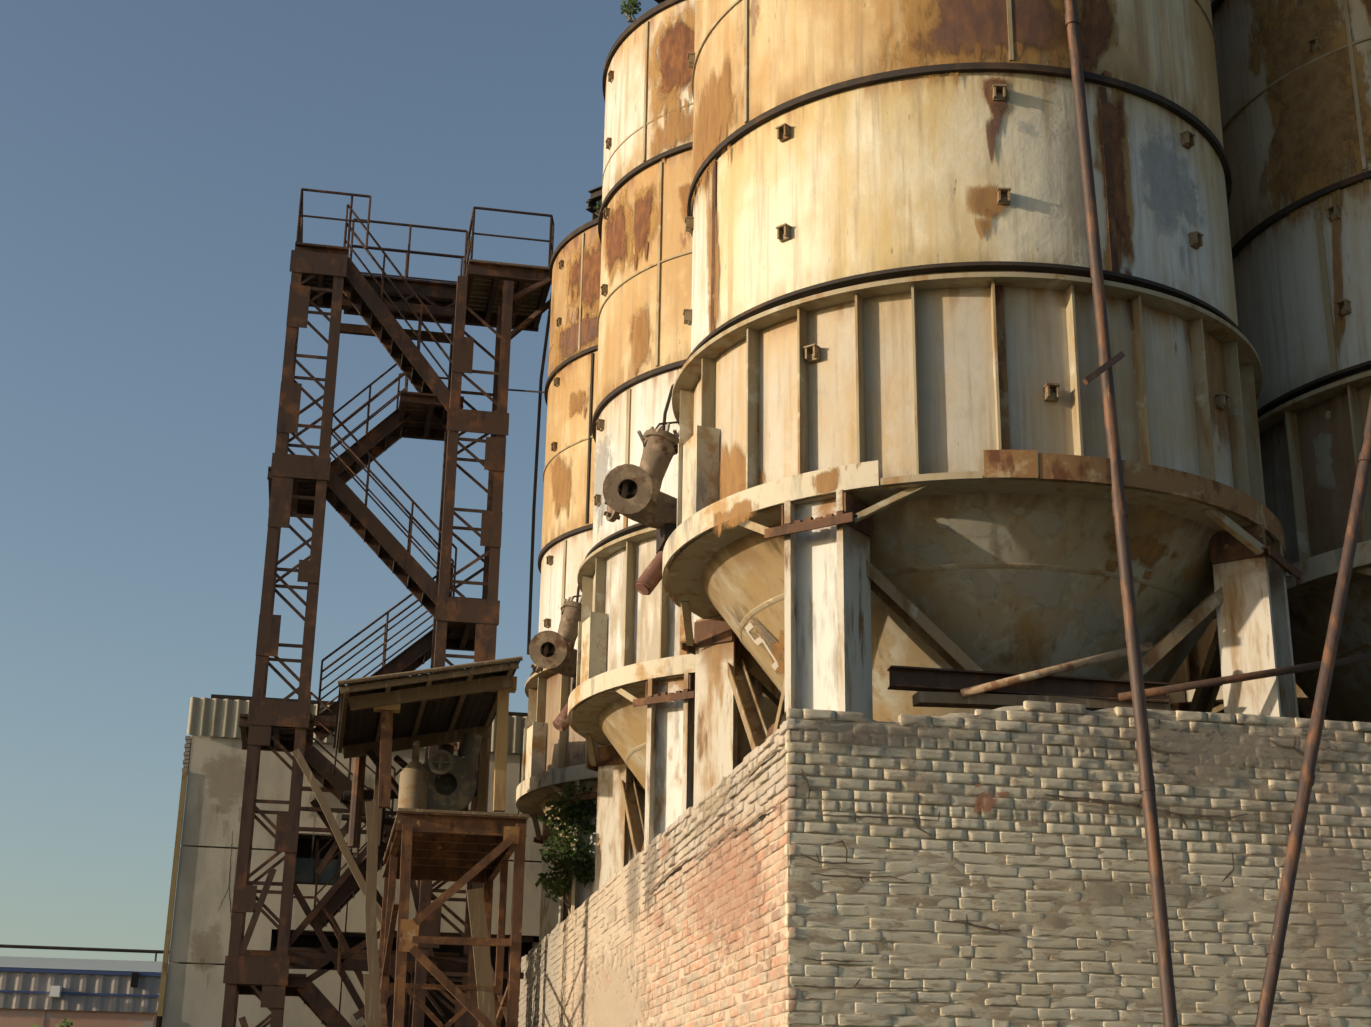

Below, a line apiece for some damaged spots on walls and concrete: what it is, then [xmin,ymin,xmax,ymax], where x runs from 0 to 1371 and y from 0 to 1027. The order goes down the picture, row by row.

corrosion [554,186,658,376]
corrosion [648,7,738,334]
corrosion [881,0,1134,332]
corrosion [1249,0,1371,350]
flaking render [973,784,1010,812]